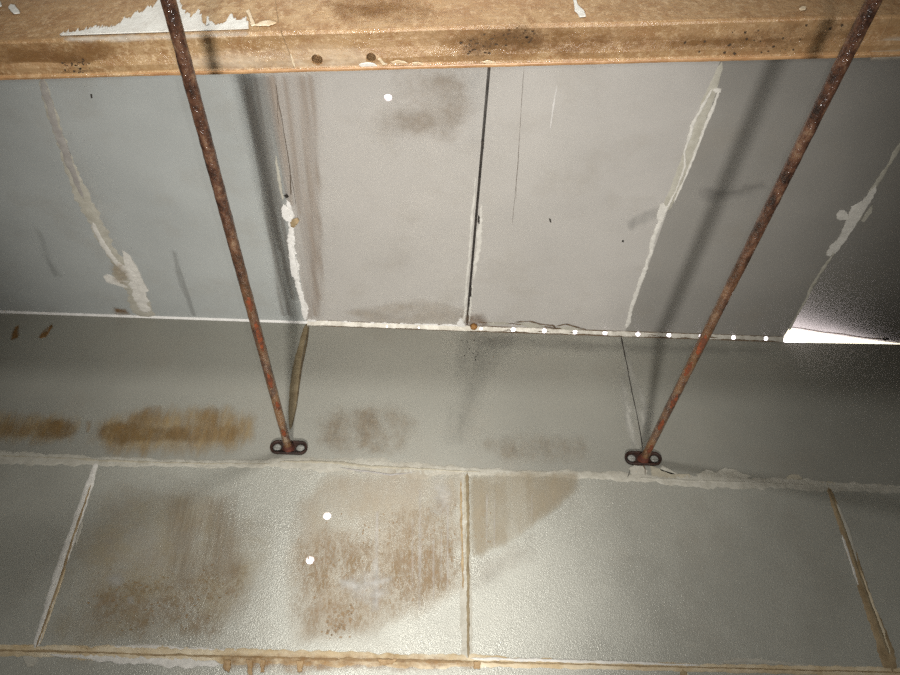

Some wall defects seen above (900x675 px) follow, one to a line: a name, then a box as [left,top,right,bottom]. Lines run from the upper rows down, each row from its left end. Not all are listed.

peeling [60,0,169,41]
peeling [177,0,276,37]
damp [455,27,541,55]
damp [298,505,456,639]